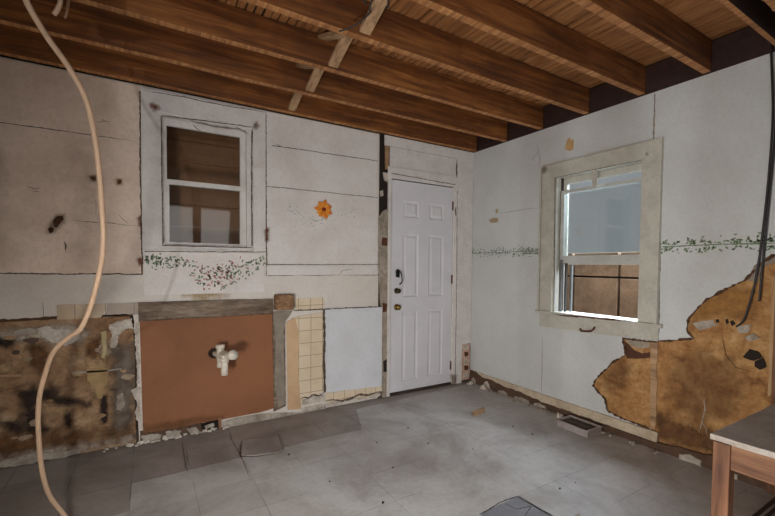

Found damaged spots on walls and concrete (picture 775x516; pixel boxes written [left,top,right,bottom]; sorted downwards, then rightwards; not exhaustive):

flaking render [0,316,80,346]
water stain [28,345,48,373]
water stain [87,337,101,357]
flaking render [462,254,775,470]
water stain [100,341,135,439]
water stain [0,387,92,460]
flaking render [0,449,81,467]
flaking render [734,471,767,490]